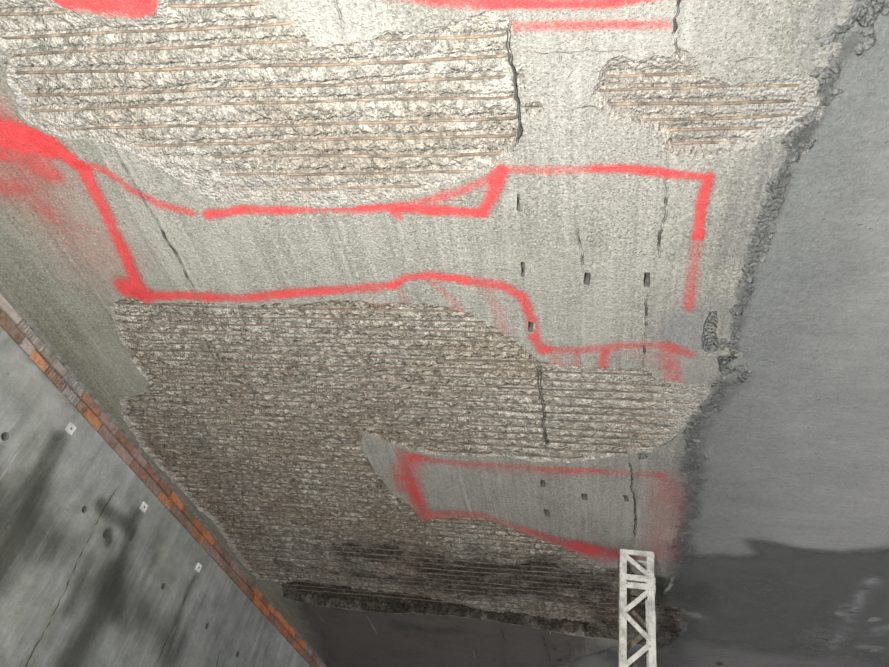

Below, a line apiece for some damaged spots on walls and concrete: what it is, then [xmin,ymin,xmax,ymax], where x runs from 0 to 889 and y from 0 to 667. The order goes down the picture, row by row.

crack [669,0,680,56]
spalling [0,0,545,206]
spalling [588,47,821,160]
spalling [701,311,738,373]
spalling [110,297,709,662]
crack [628,462,637,537]
leakage [607,541,889,667]